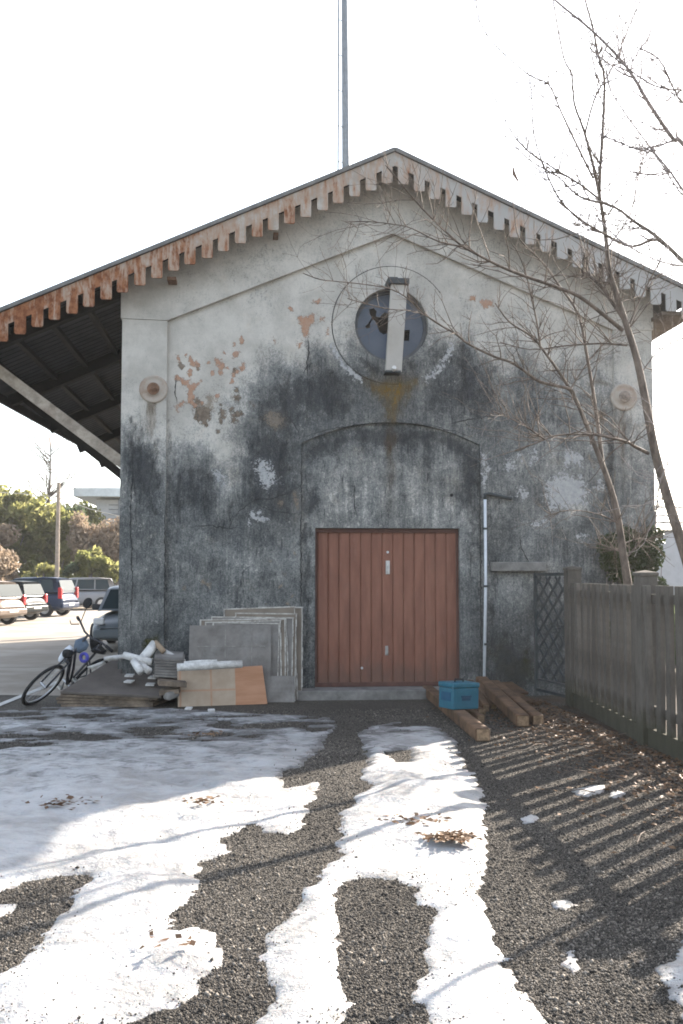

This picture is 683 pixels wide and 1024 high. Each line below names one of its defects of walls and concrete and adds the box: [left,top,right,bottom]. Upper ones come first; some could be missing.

peeling [288,299,363,384]
peeling [174,336,245,433]
spalling [248,457,299,527]